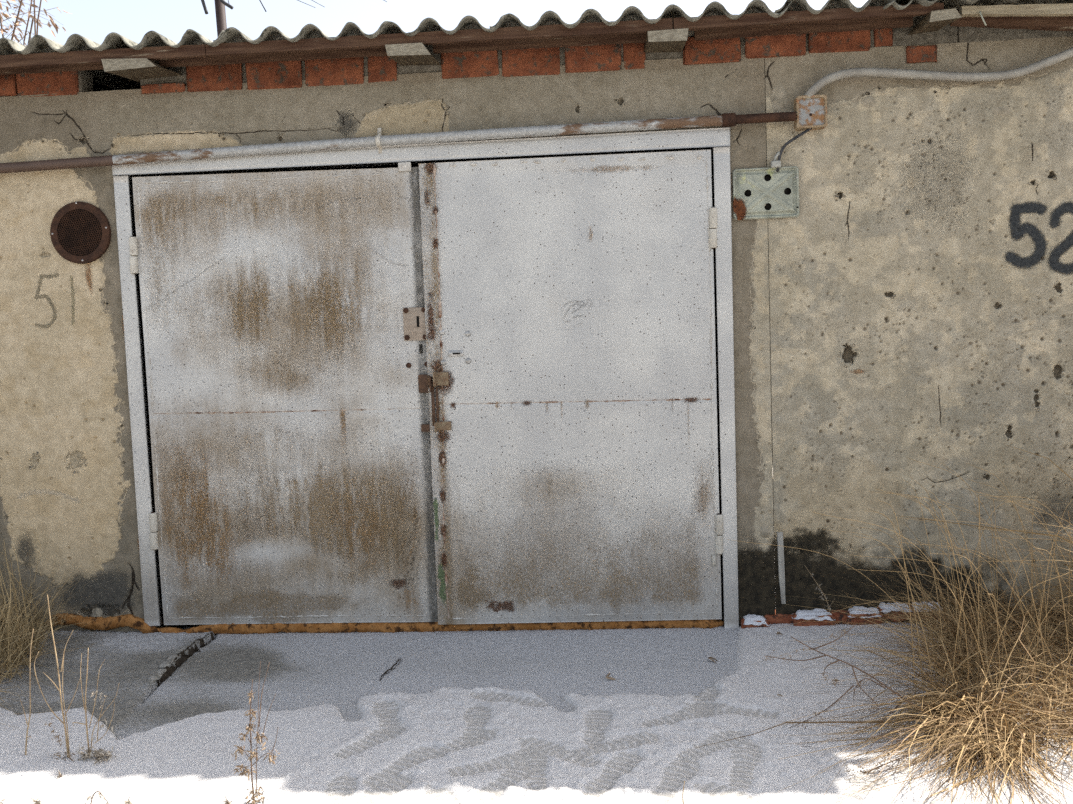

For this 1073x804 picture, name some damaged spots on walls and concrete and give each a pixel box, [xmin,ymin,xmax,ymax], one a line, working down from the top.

rust [736,111,796,124]
rust [0,155,114,174]
rust [230,272,276,335]
rust [289,270,360,346]
rust [424,163,698,625]
rust [163,456,250,583]
rust [262,469,418,607]